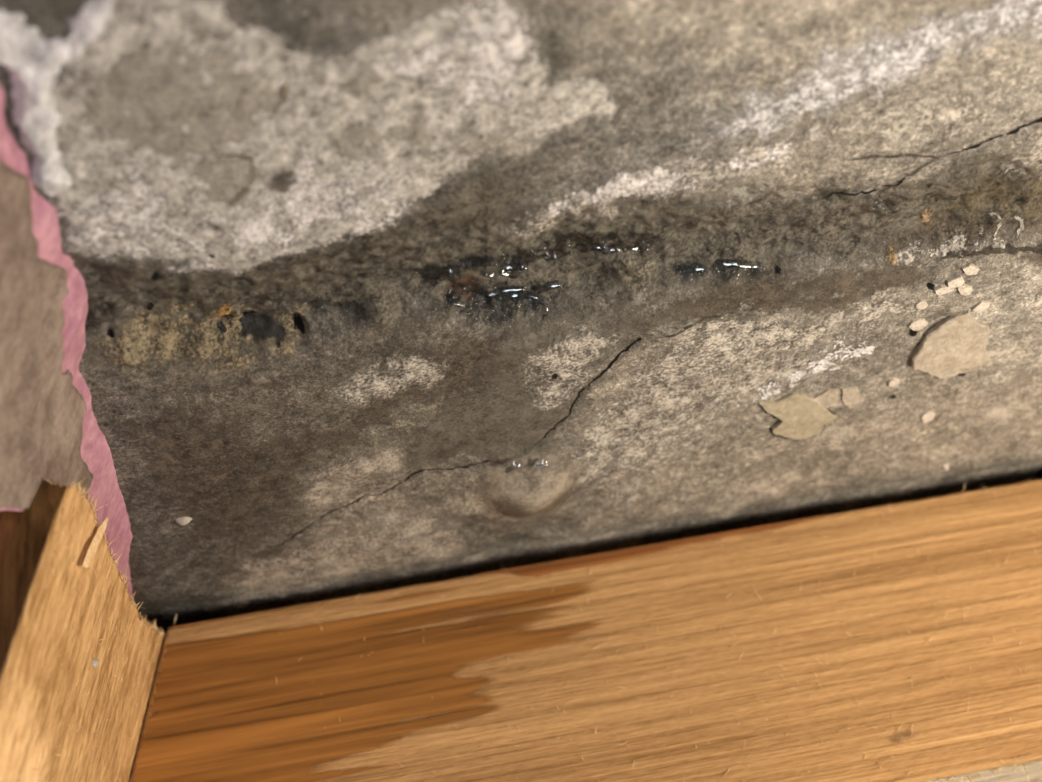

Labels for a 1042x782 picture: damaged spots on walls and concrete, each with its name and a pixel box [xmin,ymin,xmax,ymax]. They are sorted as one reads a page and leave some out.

crack [824,118,1042,208]
leakage [0,0,1042,536]
crack [529,315,726,452]
peeling [758,386,864,441]
peeling [908,263,991,379]
crack [266,460,497,548]
leakage [171,461,828,628]
leakage [134,583,598,782]